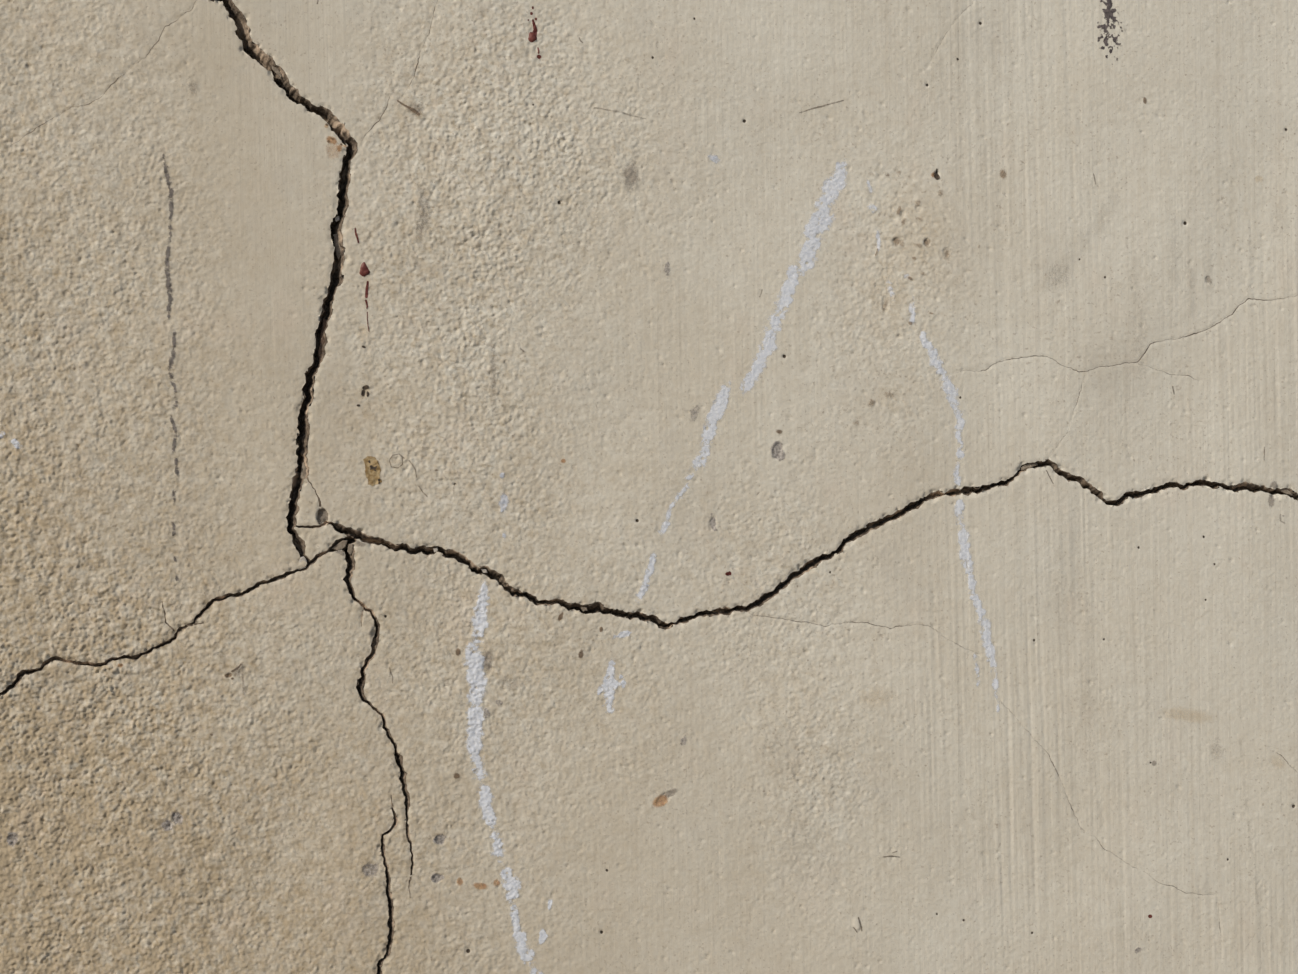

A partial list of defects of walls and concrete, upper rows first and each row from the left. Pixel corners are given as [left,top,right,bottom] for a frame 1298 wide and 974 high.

crack [1185,298,1265,337]
crack [0,0,414,893]
crack [326,459,1298,630]
crack [377,796,398,974]